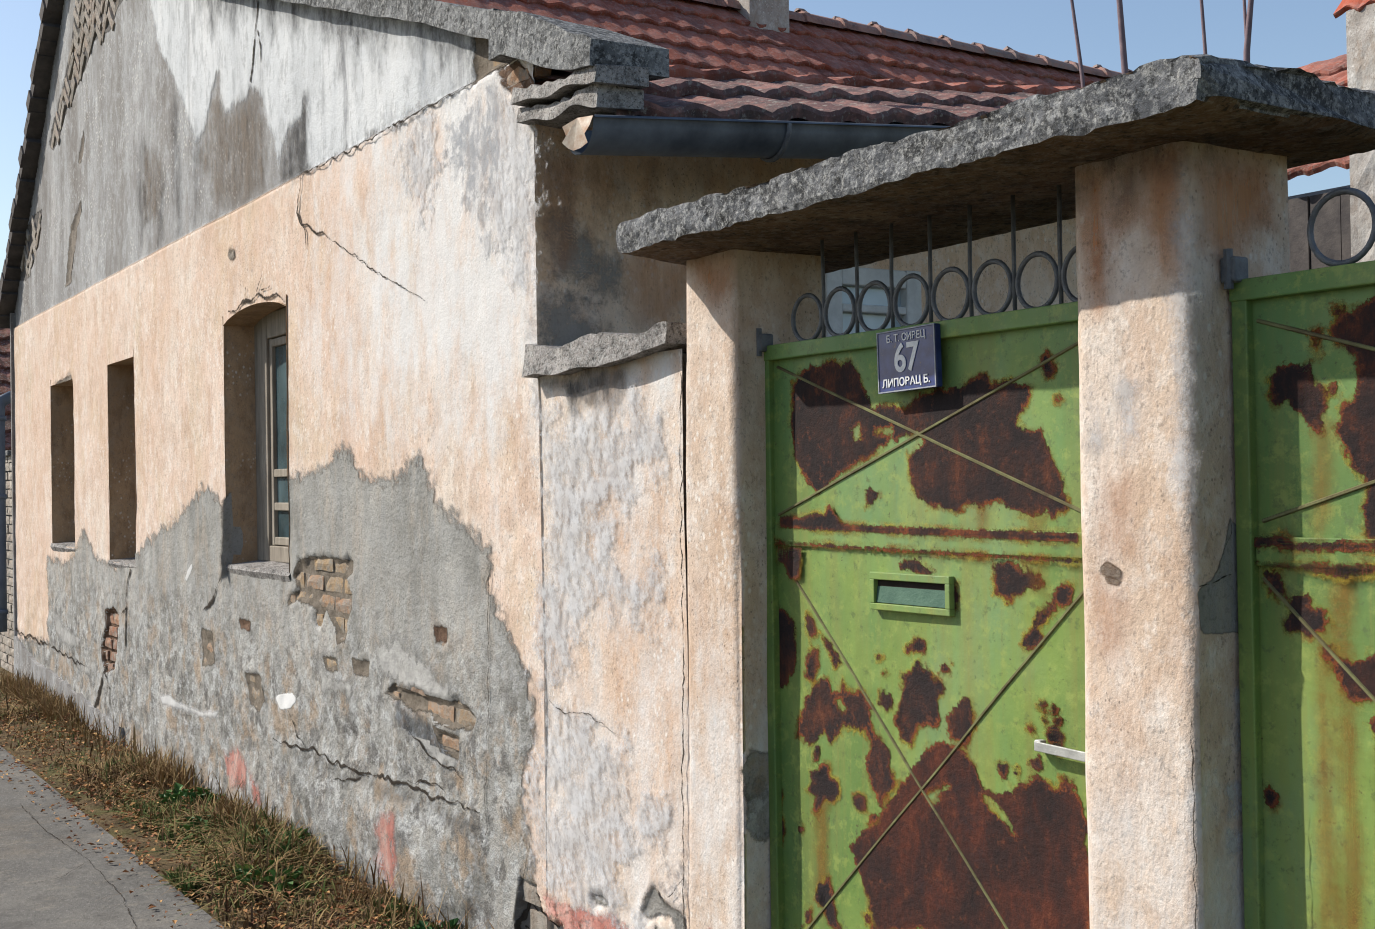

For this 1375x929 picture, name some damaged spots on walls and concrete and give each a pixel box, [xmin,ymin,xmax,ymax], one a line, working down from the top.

flaking render [20,209,42,281]
flaking render [49,0,123,151]
water stain [284,105,306,175]
peeling [150,0,622,294]
crack [296,63,506,299]
flaking render [541,295,601,345]
flaking render [19,384,684,929]
crack [273,559,489,858]
corrosion [775,349,1079,651]
corrosion [779,608,1090,929]
flaking render [1197,519,1238,634]
corrosion [1254,296,1375,733]